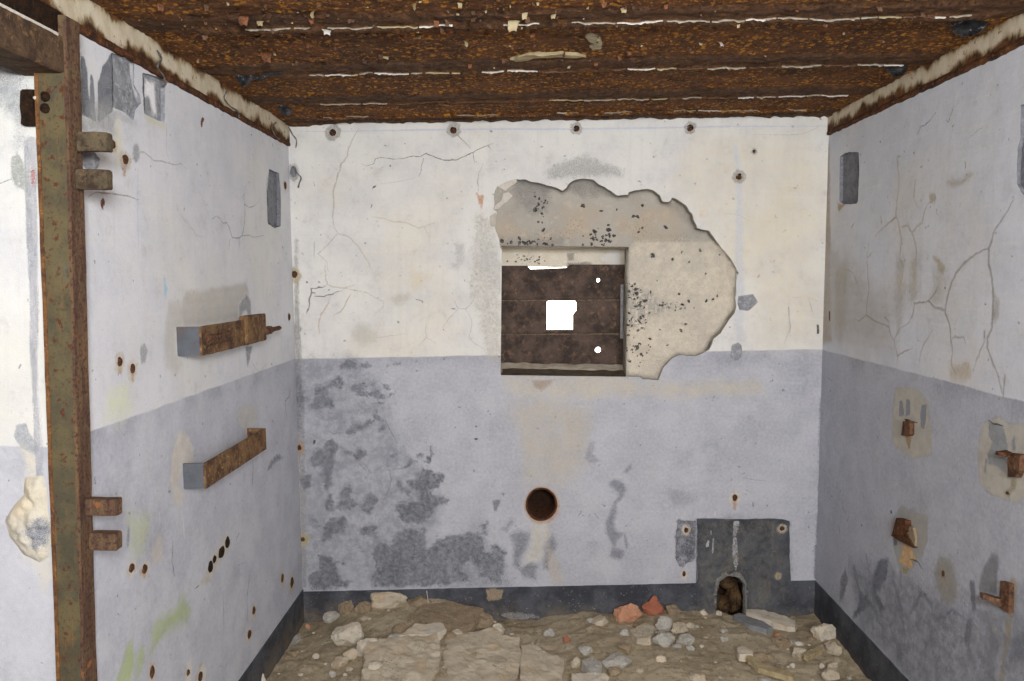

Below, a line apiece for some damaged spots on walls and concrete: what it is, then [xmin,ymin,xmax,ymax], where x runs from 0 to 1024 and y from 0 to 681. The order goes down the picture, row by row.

peeling [79,24,291,146]
peeling [245,24,453,35]
peeling [309,56,460,77]
crack [371,134,490,191]
peeling [504,20,539,32]
peeling [320,94,848,141]
peeling [572,14,972,50]
peeling [827,36,1024,135]
crack [307,128,392,338]
spalling [490,179,758,380]
crack [852,156,1015,396]
damp [293,240,559,591]